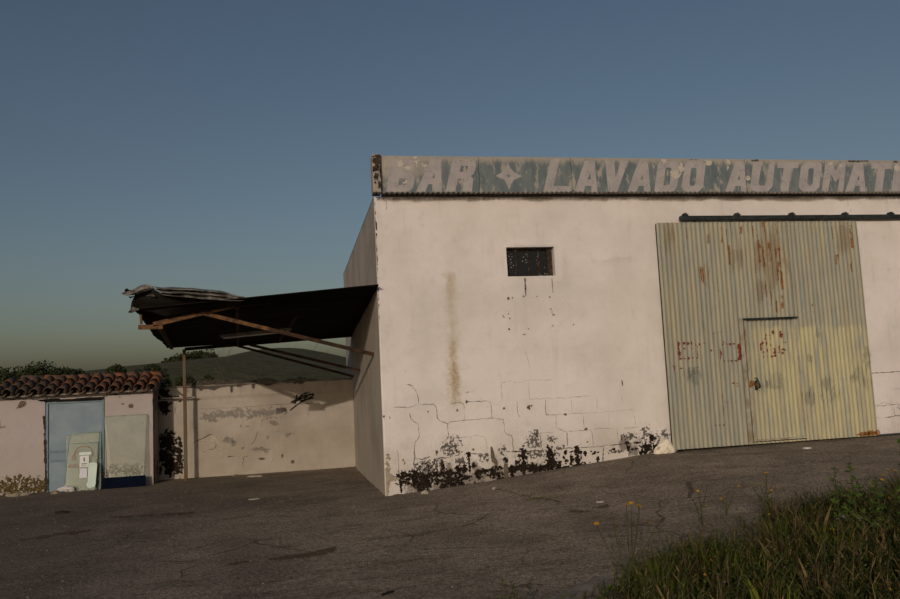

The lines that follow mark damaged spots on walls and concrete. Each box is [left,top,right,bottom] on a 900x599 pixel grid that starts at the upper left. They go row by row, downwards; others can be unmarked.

rust [740,221,784,313]
crack [393,355,636,477]
damp [385,424,671,495]